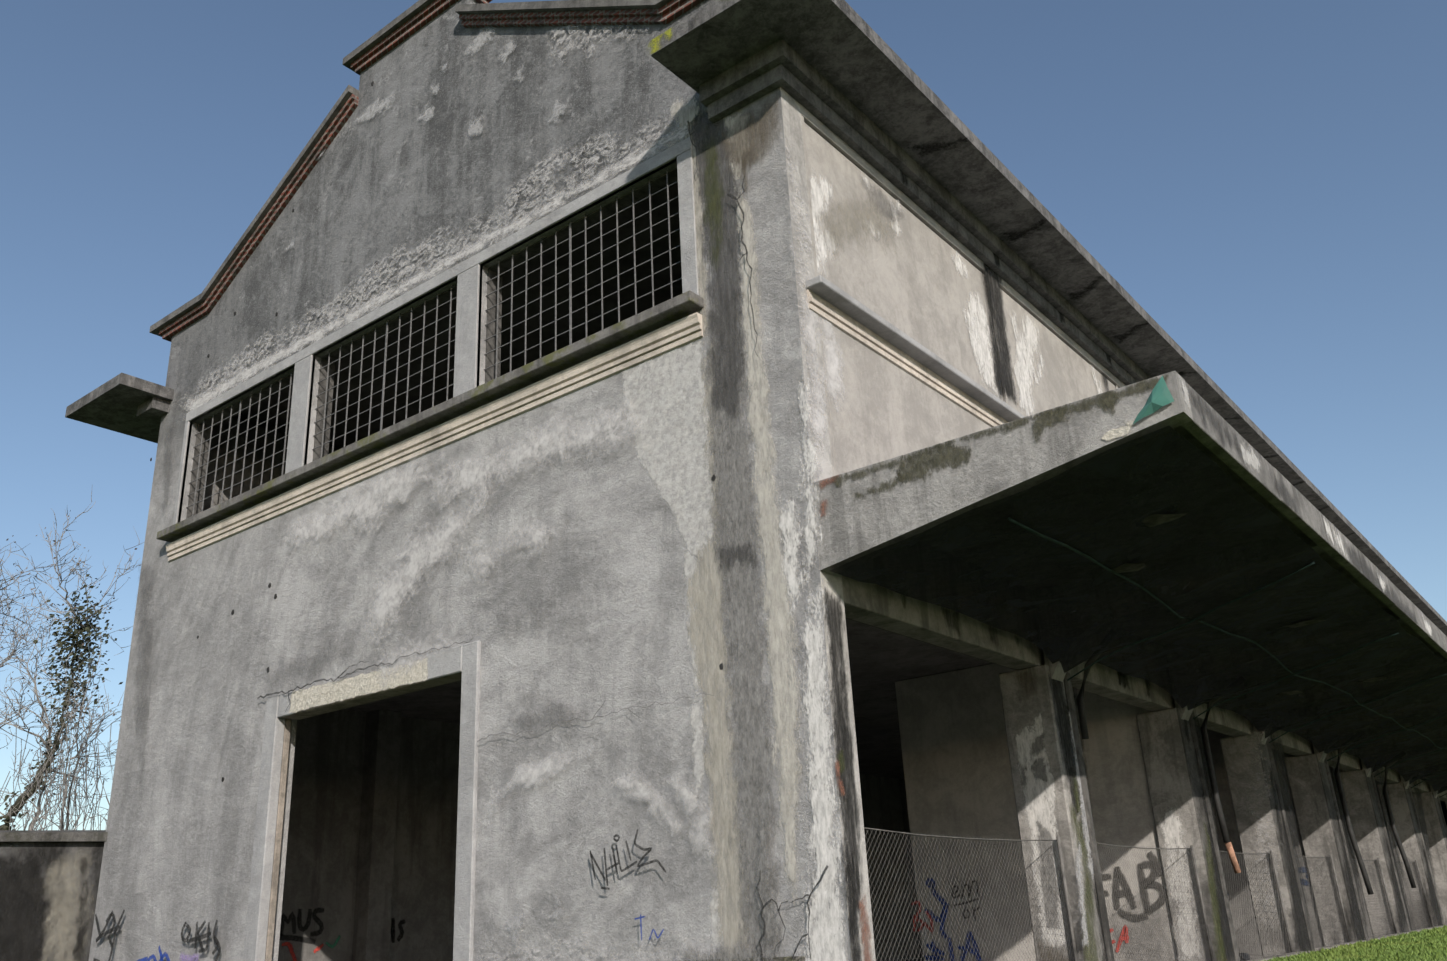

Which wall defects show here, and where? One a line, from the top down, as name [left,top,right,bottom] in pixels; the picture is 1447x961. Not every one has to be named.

damp [833,253,1277,498]
damp [683,103,782,961]
damp [1319,506,1431,635]
crack [257,639,472,712]
damp [825,588,862,961]
damp [1018,667,1092,838]
damp [0,850,60,961]
damp [73,861,88,961]
damp [1092,860,1108,961]